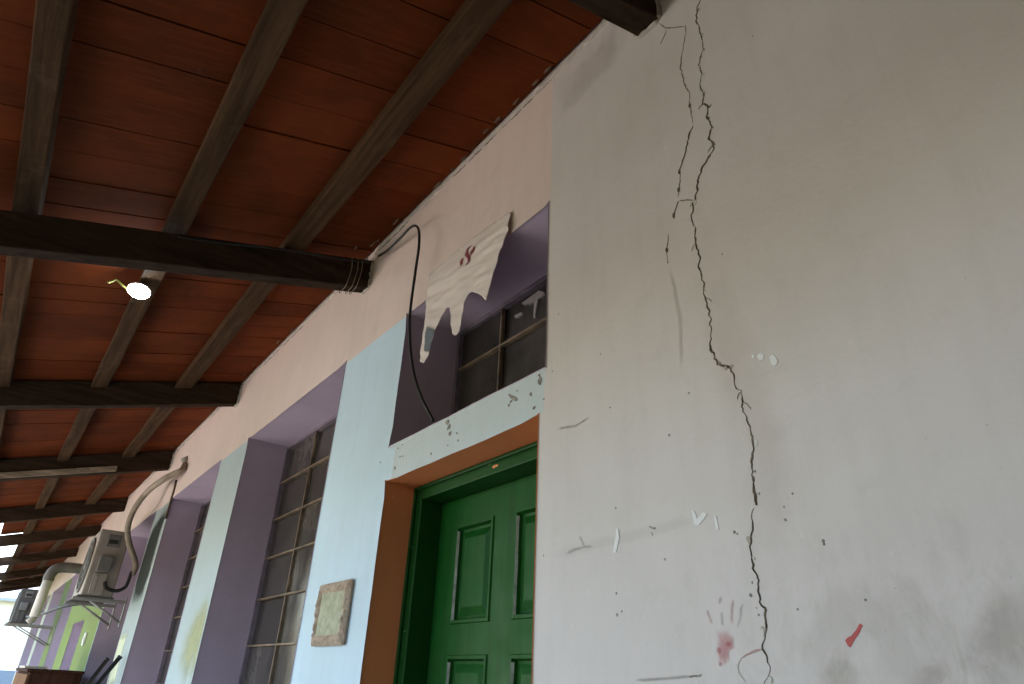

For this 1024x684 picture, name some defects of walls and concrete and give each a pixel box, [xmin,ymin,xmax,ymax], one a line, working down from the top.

crack [659,0,773,684]